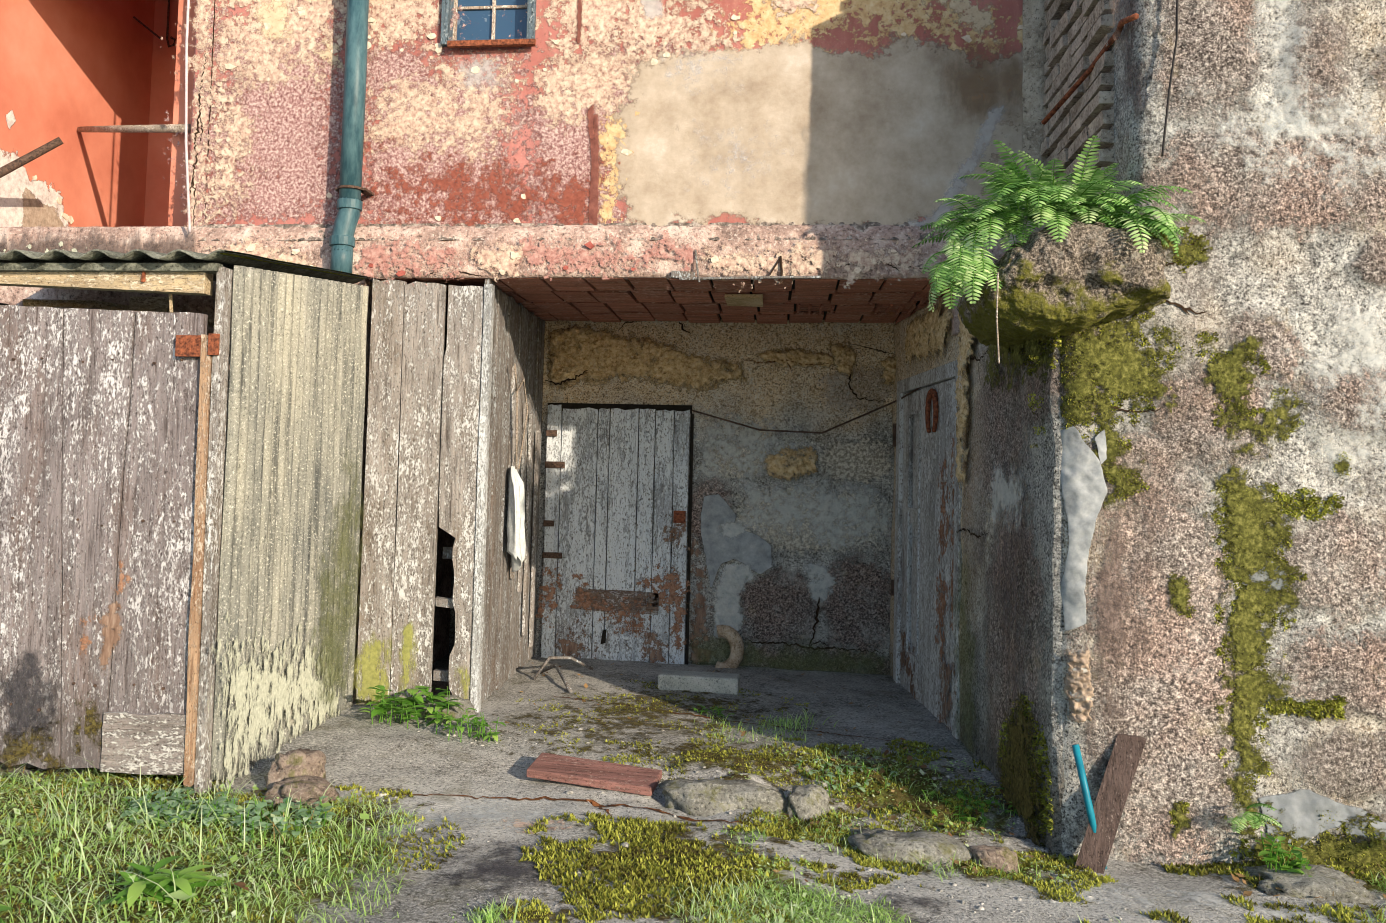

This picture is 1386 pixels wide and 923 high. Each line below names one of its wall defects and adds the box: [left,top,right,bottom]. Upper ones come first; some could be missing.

peeling [5,110,16,129]
peeling [161,0,347,266]
peeling [354,0,1023,293]
peeling [0,148,74,227]
spalling [547,323,749,391]
crack [743,597,884,654]
water stain [0,651,103,779]